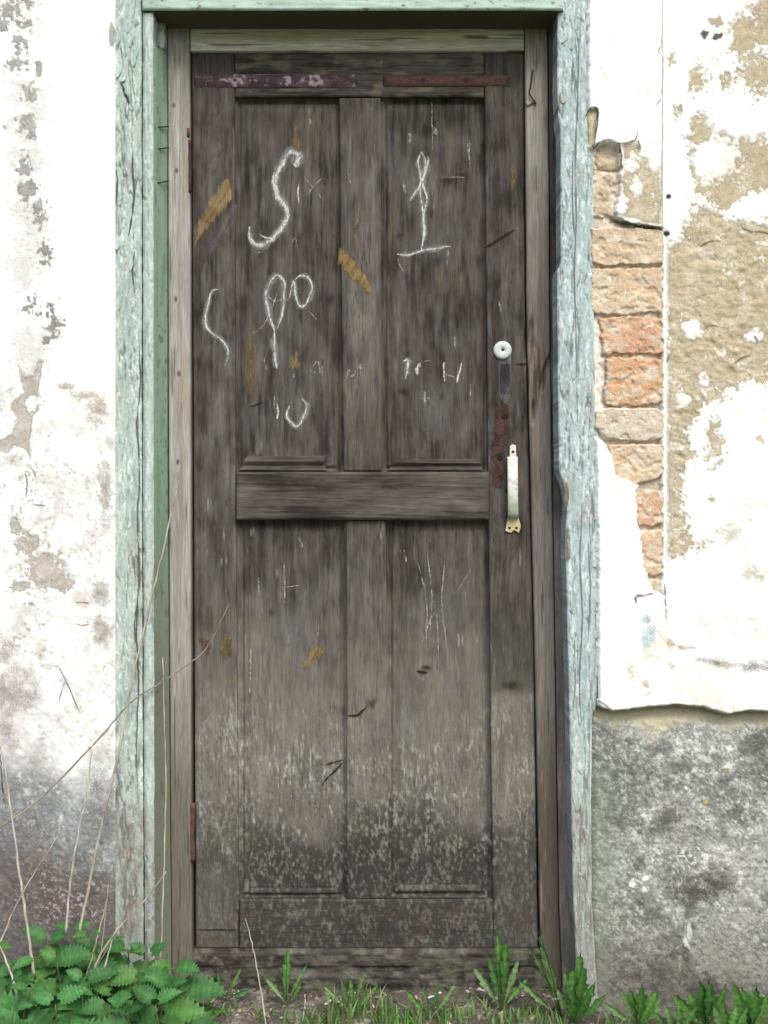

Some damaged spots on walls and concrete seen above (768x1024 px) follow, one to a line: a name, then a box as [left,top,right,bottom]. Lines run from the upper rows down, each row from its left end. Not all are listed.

peeling [0,0,53,267]
peeling [17,293,66,344]
spalling [587,0,768,592]
flaking render [0,361,42,455]
flaking render [9,518,75,595]